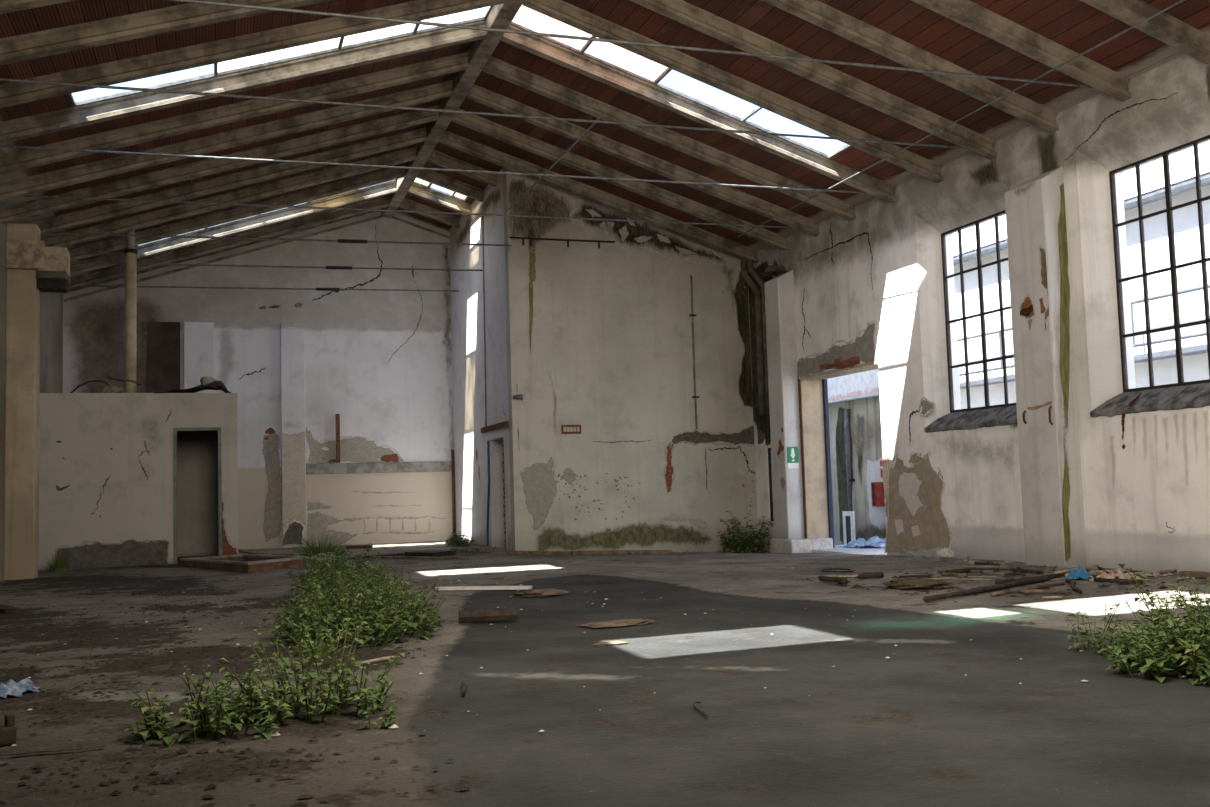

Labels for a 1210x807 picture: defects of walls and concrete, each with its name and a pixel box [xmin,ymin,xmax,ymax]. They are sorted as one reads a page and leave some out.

crack [313,221,383,300]
crack [804,224,873,290]
crack [389,267,423,360]
crack [802,292,811,349]
flaking render [797,321,880,384]
flaking render [220,500,238,555]
peeling [263,426,404,548]
peeling [520,458,641,530]
flaking render [663,421,765,493]
flaking render [828,387,953,557]